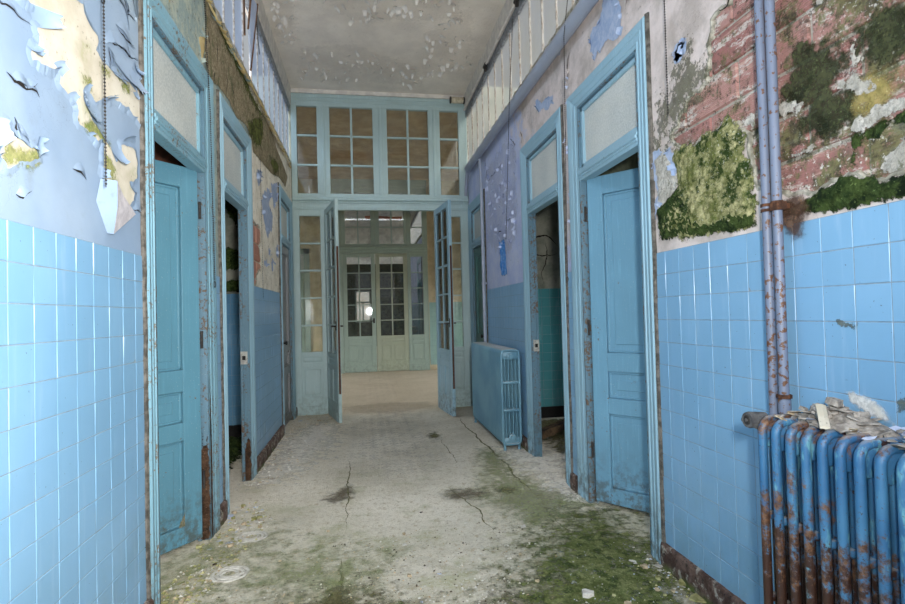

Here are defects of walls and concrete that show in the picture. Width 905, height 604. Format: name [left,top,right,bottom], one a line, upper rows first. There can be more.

peeling [300,0,471,90]
peeling [588,0,623,61]
peeling [0,117,49,176]
peeling [15,0,149,234]
spalling [651,0,905,218]
leakage [851,73,897,115]
peeling [253,169,280,286]
crack [344,460,352,529]
crack [460,418,565,528]